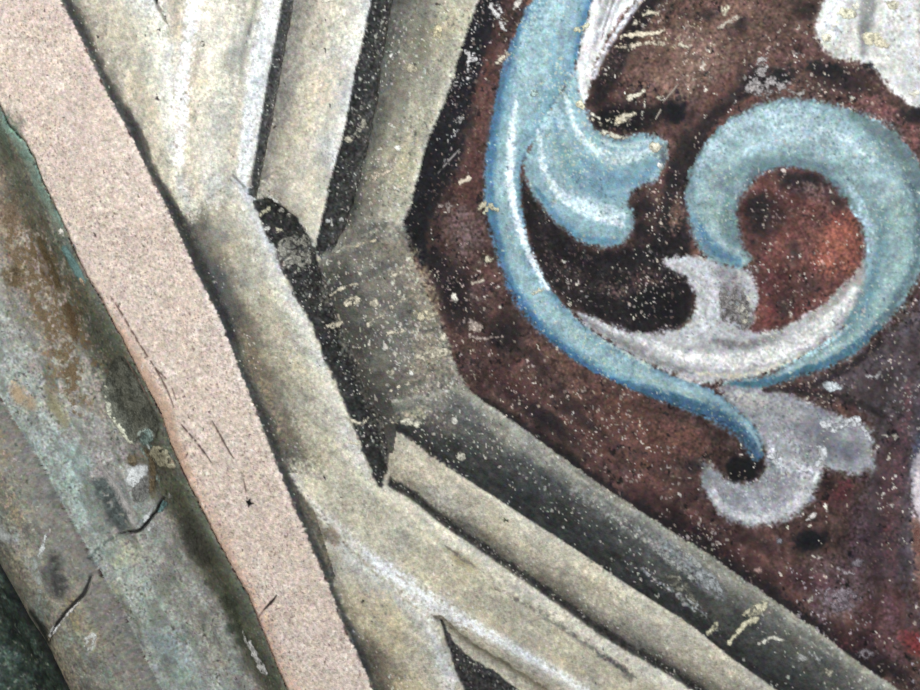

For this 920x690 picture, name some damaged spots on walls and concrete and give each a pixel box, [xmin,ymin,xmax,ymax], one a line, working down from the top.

crack [112,299,234,462]
crack [48,494,170,640]